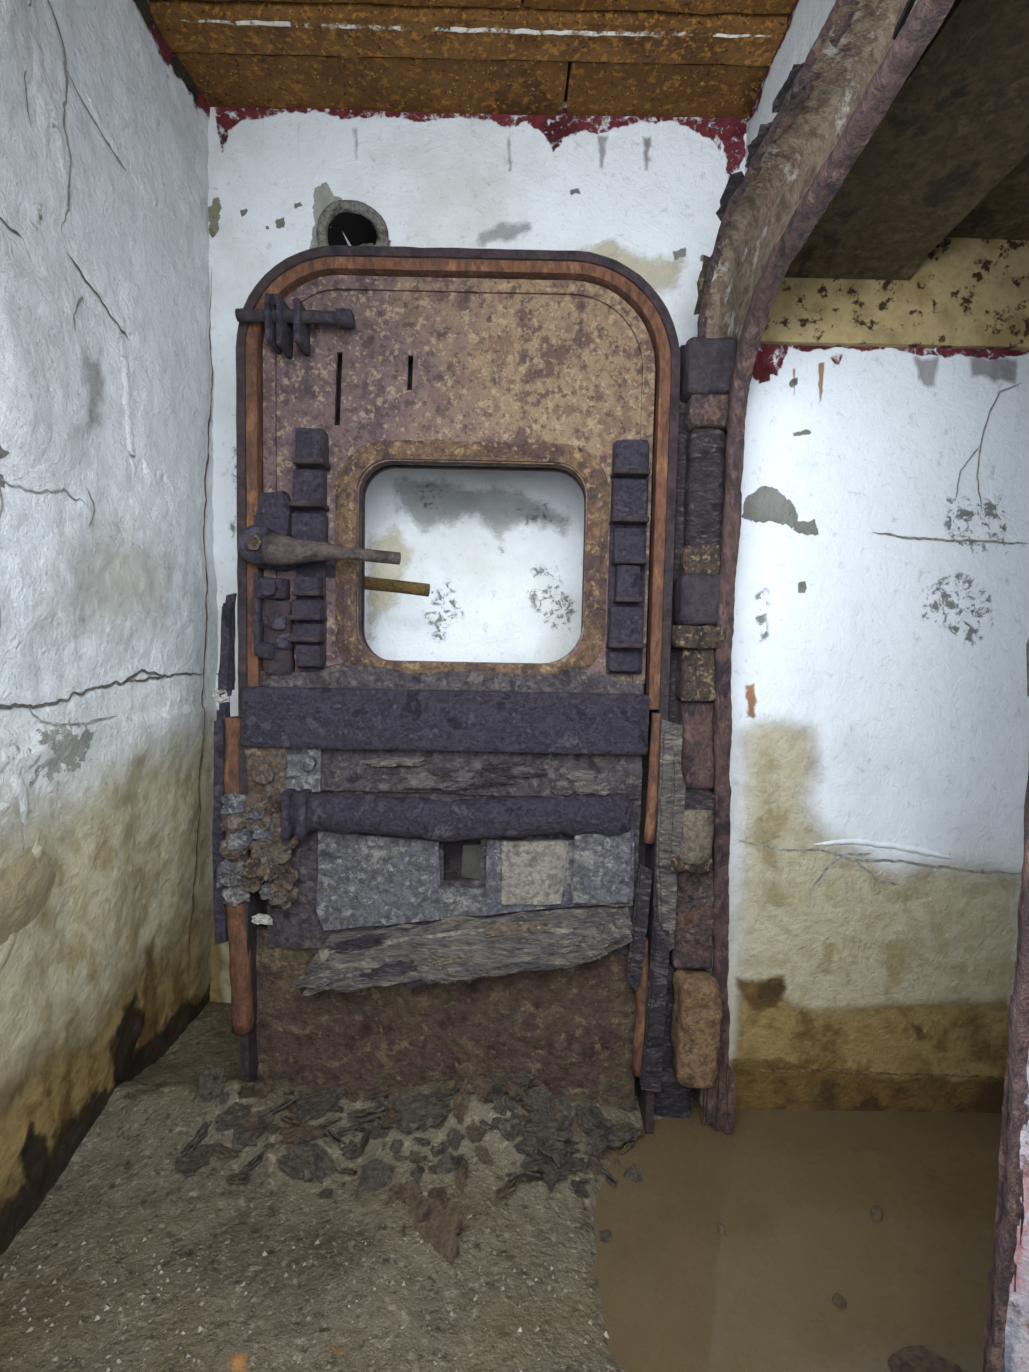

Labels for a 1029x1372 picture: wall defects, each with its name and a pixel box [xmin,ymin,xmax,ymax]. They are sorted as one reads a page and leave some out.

peeling [215,0,799,175]
flaking render [741,486,819,535]
water stain [30,719,94,791]
water stain [0,731,231,1256]
water stain [732,726,1018,1113]